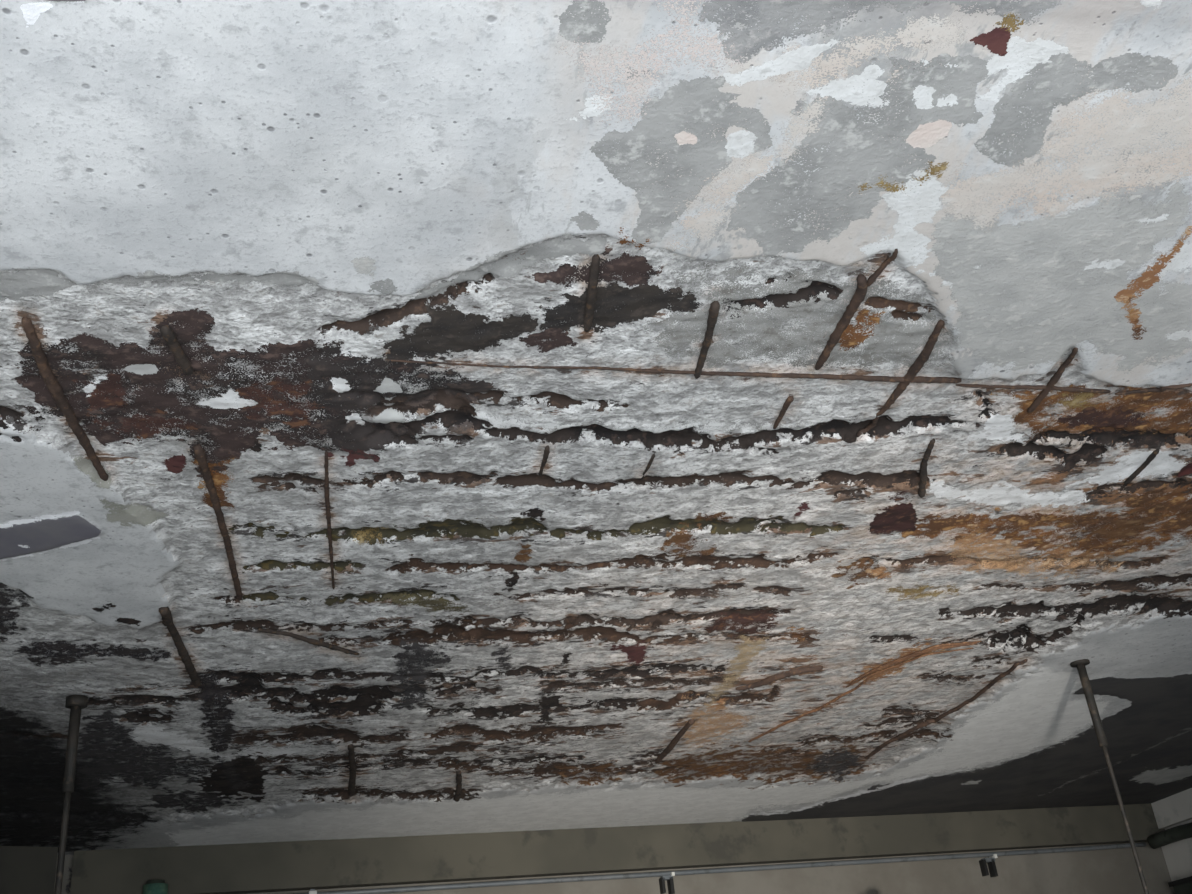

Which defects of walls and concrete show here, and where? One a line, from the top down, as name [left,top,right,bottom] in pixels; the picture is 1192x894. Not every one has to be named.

peeling [974,52,1178,167]
rust [1113,226,1192,340]
rust [14,227,703,510]
peeling [343,403,451,424]
rust [981,383,1192,440]
peeling [0,510,101,561]
rust [830,556,965,601]
rust [868,482,1192,582]
peeling [148,789,242,814]
water stain [128,725,316,786]
rust [654,608,880,790]
peeling [742,674,1192,822]